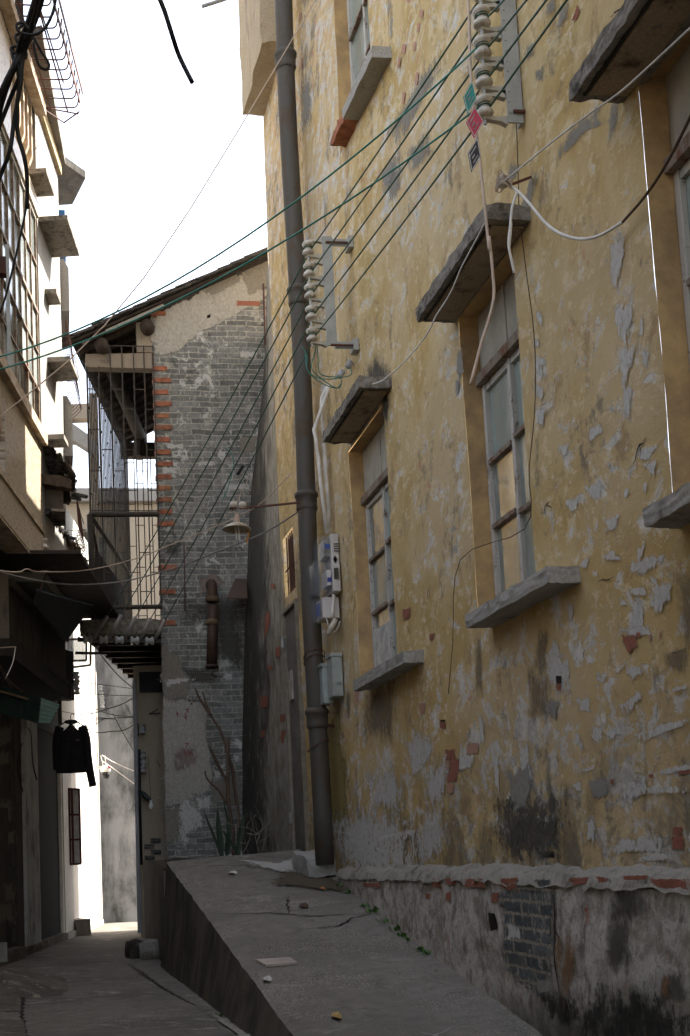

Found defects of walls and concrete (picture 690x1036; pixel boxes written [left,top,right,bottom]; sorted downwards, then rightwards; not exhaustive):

peeling [604,228,648,419]
peeling [639,444,657,492]
flaking render [544,543,690,752]
flaking render [164,754,241,850]
flaking render [332,711,484,871]
flaking render [483,737,690,865]
flaking render [425,877,555,1002]
flaking render [567,876,609,885]
damp [608,888,643,969]
flaking render [622,875,690,890]
crack [19,997,30,1036]
damp [541,974,690,1036]